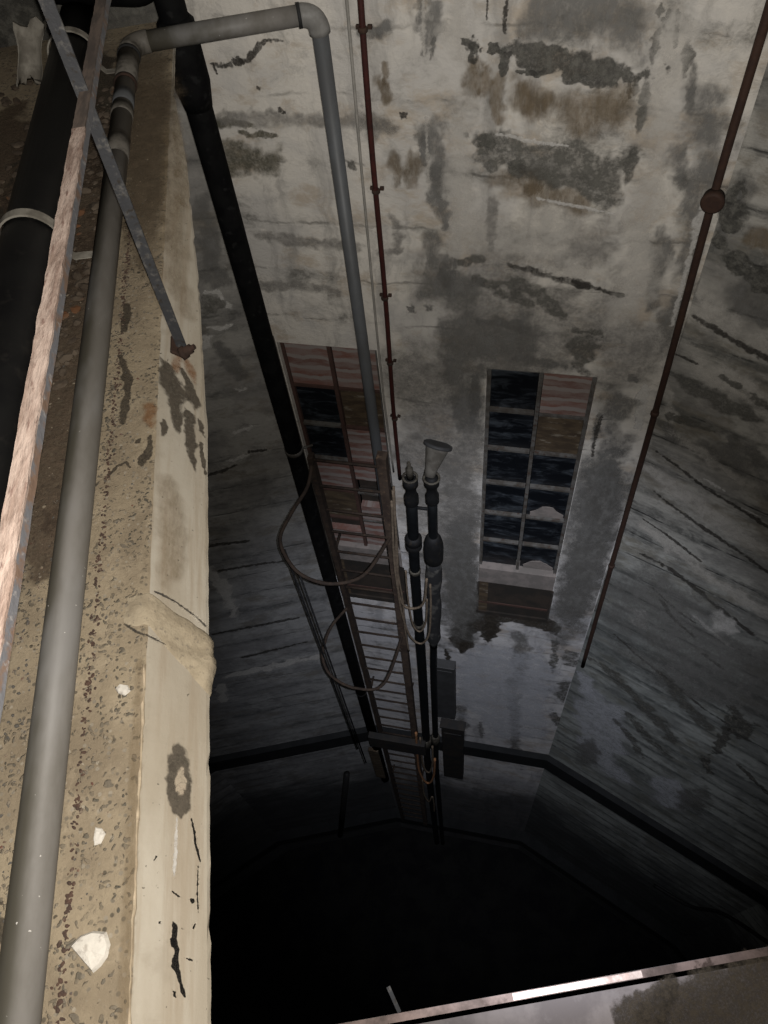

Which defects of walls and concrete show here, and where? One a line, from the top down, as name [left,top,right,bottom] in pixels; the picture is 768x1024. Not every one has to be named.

damp [388,0,724,756]
damp [675,374,768,422]
damp [693,611,738,648]
damp [166,744,192,873]
crack [170,818,201,998]